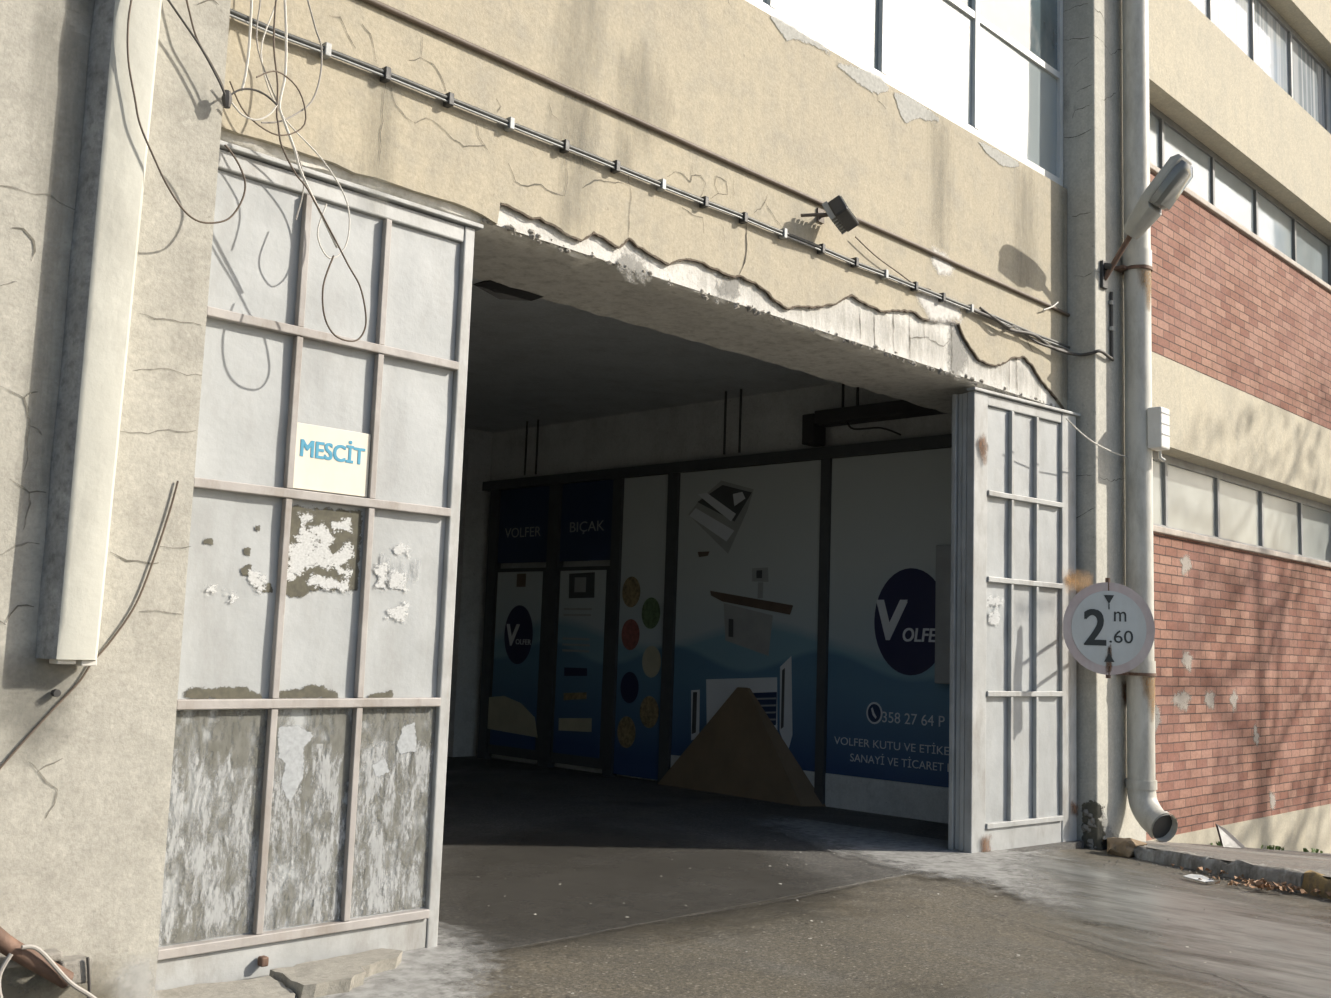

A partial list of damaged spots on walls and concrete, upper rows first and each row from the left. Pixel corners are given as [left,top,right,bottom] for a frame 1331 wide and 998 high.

crack [339,16,405,154]
peeling [771,15,939,123]
crack [12,227,36,261]
crack [448,108,630,236]
crack [667,172,782,275]
peeling [979,142,1019,168]
spalling [473,203,1058,407]
peeling [241,504,363,598]
crack [40,758,63,818]
peeling [160,684,436,945]
damp [761,816,1331,998]
damp [317,927,497,998]